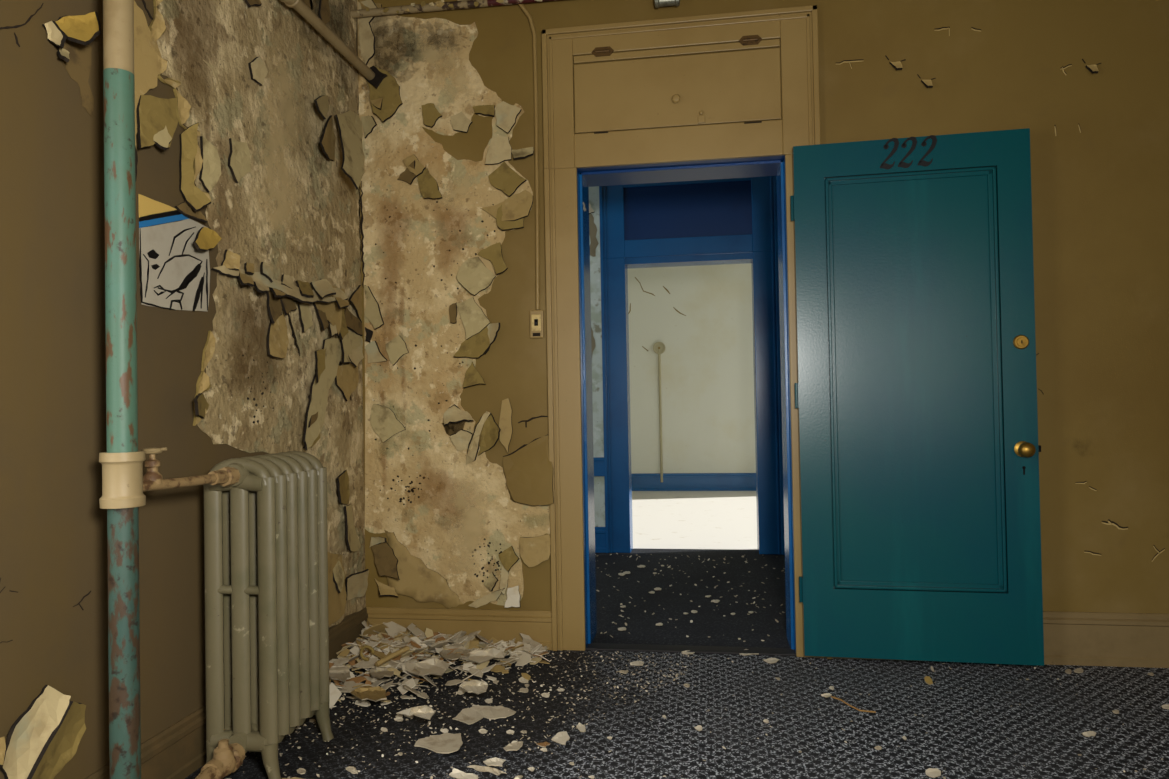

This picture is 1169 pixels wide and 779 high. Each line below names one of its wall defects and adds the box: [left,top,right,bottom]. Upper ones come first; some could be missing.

peeling [583,202,599,257]
peeling [134,0,550,627]
crack [1101,519,1128,530]
peeling [0,685,86,779]